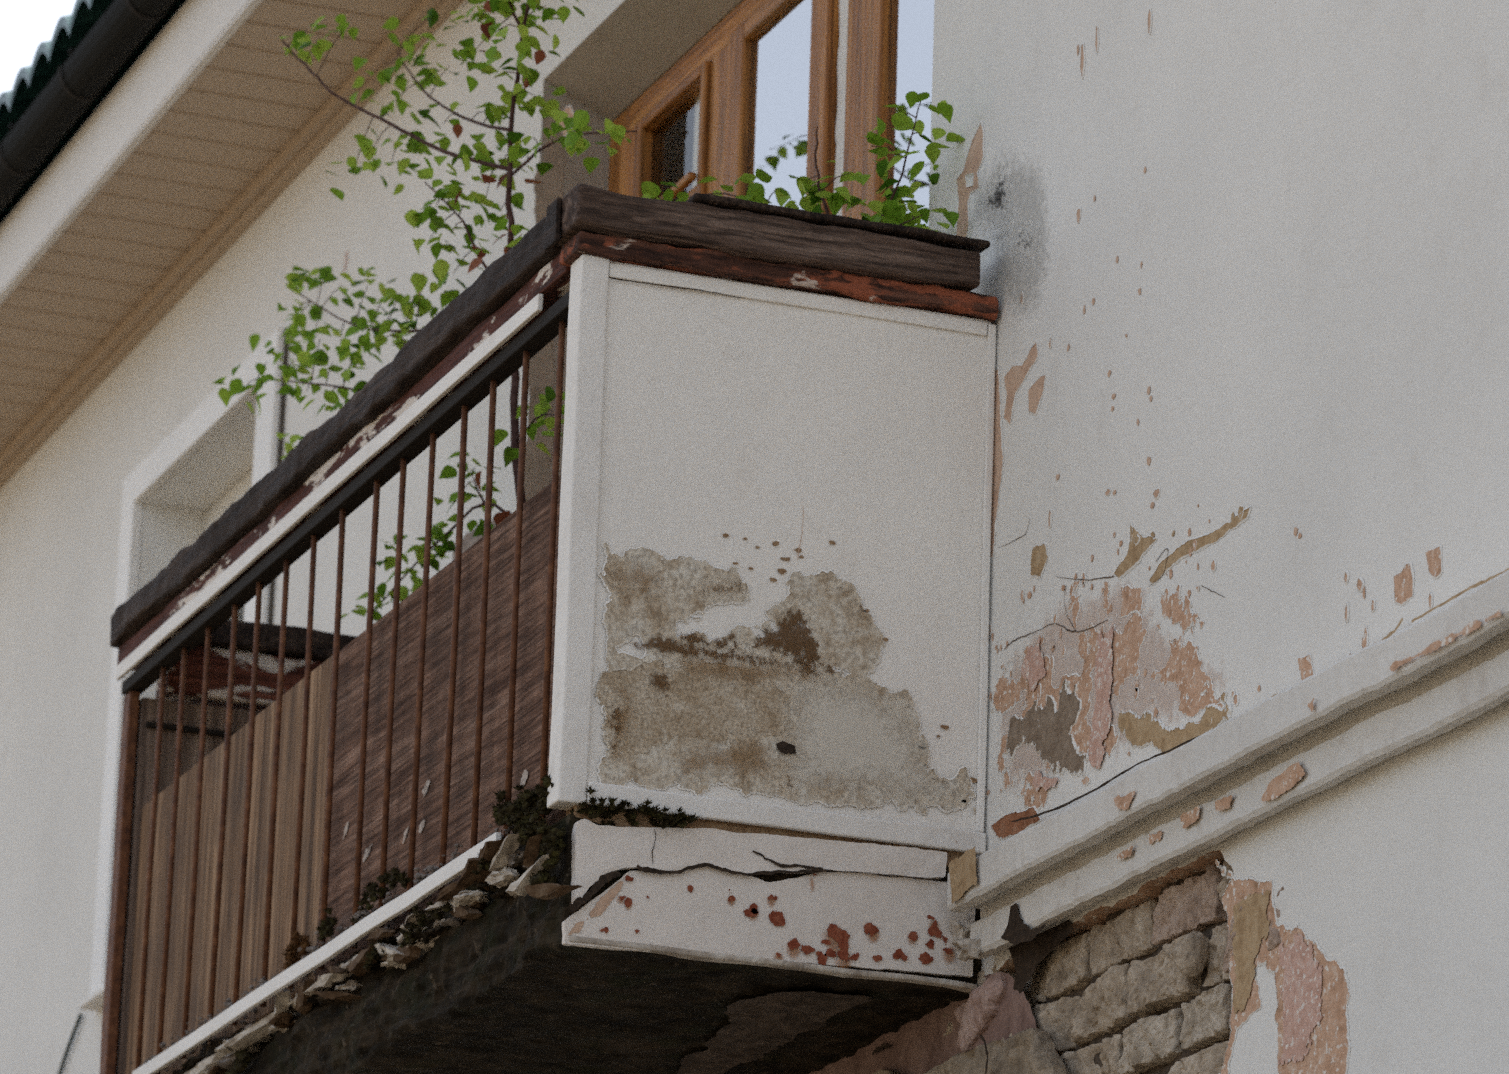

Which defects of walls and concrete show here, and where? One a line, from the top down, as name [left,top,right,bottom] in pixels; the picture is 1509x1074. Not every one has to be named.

peeling [956,121,985,237]
water stain [988,182,1012,208]
peeling [990,337,1070,559]
peeling [723,533,804,582]
peeling [1021,508,1053,604]
crack [1004,505,1252,650]
peeling [1393,544,1443,609]
crack [1375,568,1509,643]
peeling [970,528,1239,840]
crack [1011,735,1200,822]
crack [569,829,938,912]
spalling [949,847,1351,1074]